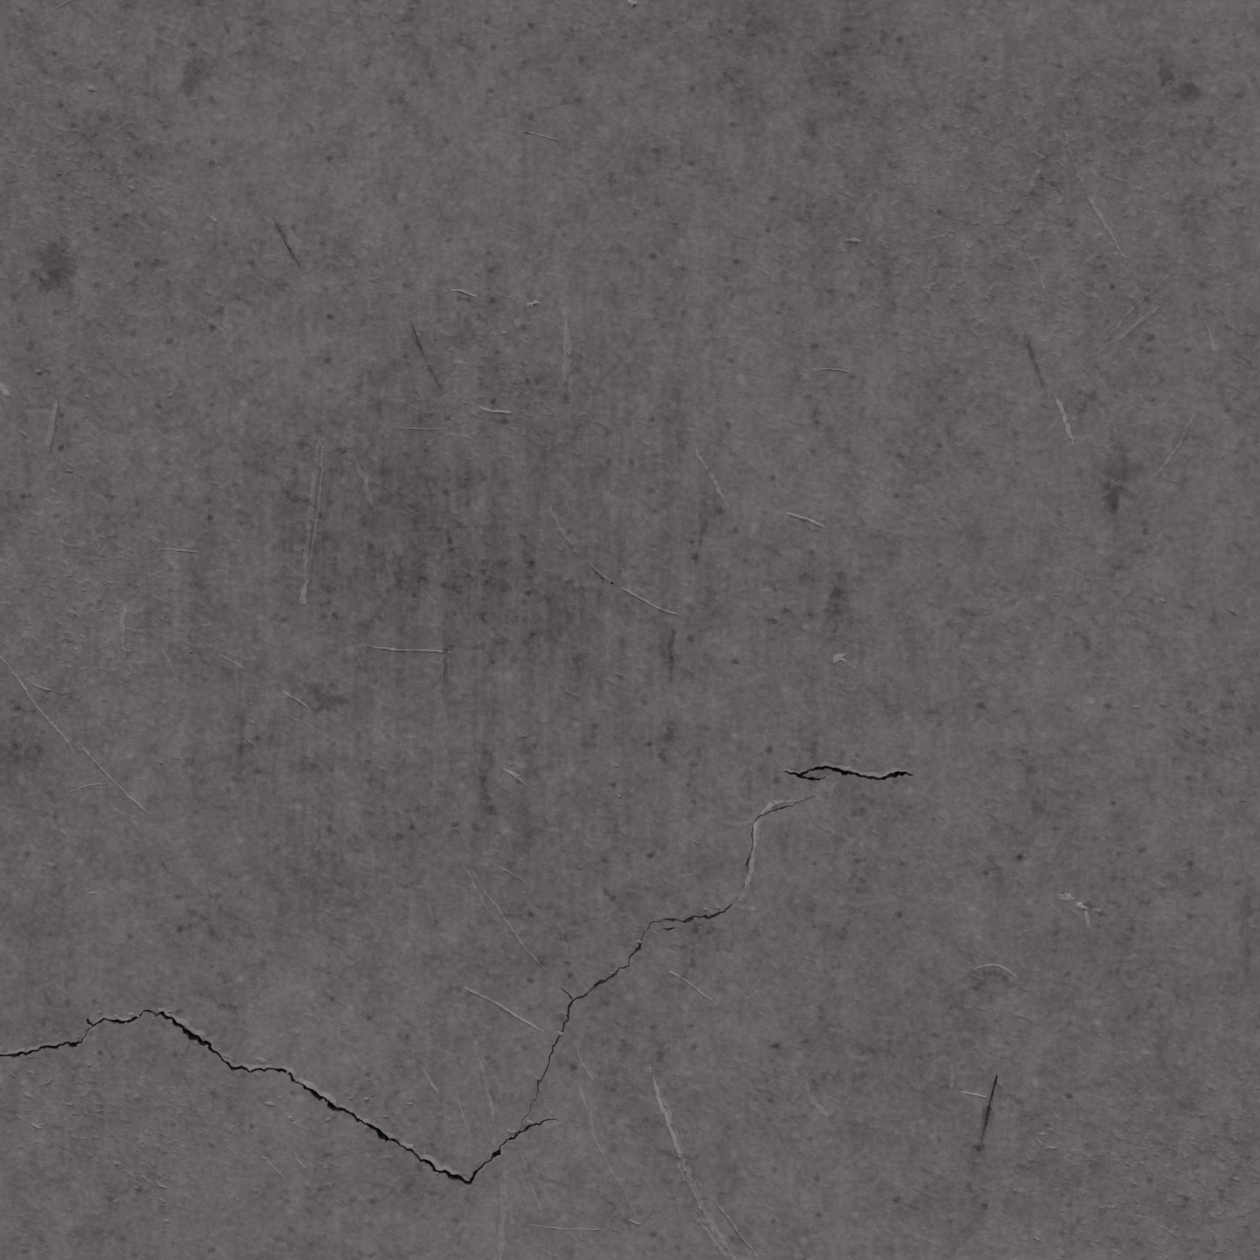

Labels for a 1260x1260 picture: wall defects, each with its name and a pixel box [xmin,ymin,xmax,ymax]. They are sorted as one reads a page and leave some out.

crack [0,762,914,1185]